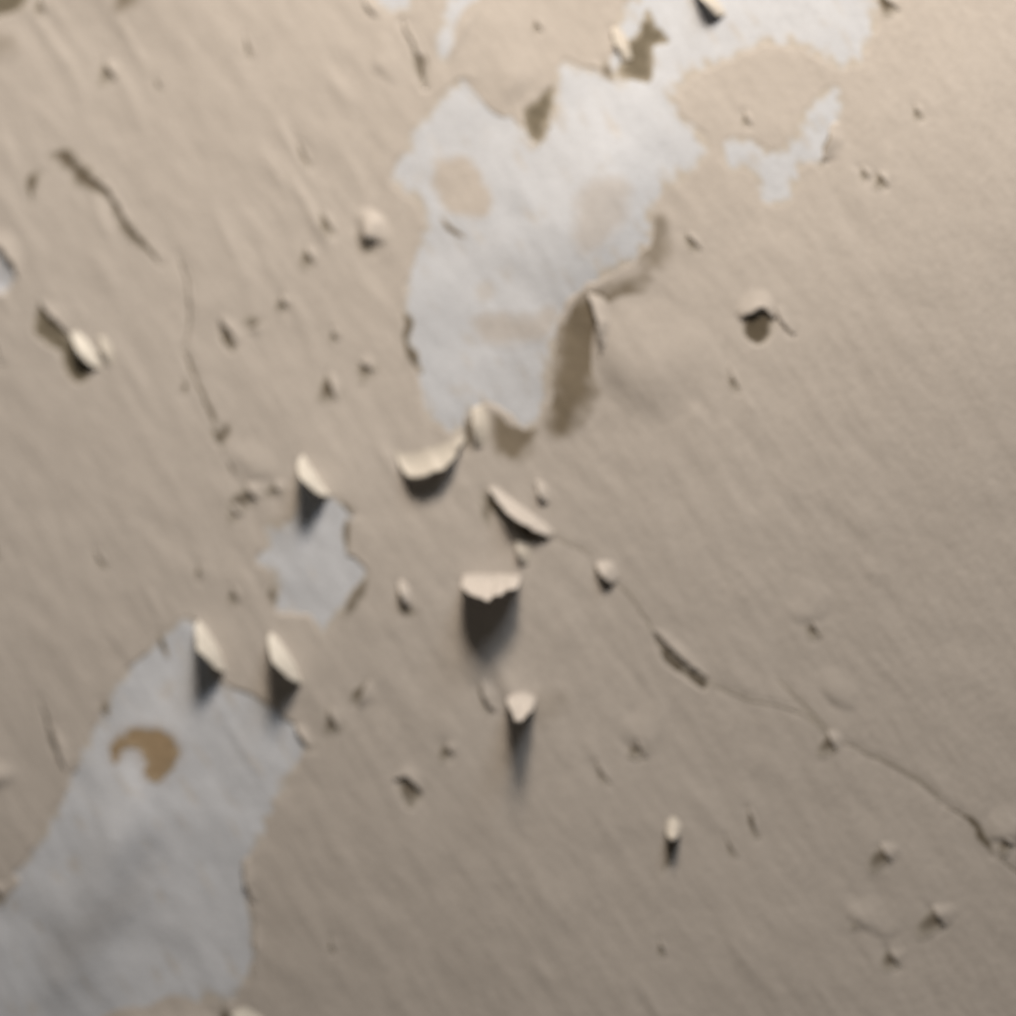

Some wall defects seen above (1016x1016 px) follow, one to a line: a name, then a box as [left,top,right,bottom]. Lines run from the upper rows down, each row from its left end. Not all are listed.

peeling [363,0,413,18]
peeling [0,228,24,292]
crack [26,147,237,479]
peeling [391,0,901,479]
peeling [227,455,366,634]
corrosion [103,715,190,789]
peeling [0,618,377,1016]
crack [707,676,1016,871]